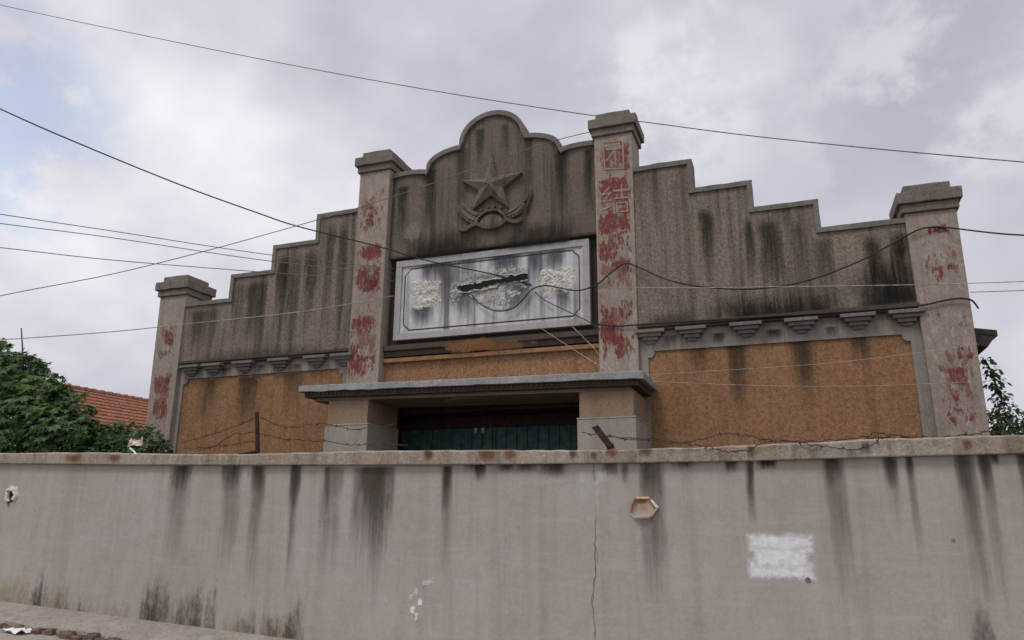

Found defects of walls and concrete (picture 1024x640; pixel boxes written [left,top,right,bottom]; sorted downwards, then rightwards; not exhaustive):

peeling [346,243,382,379]
spalling [410,266,577,313]
peeling [596,142,635,360]
leakage [863,236,914,306]
peeling [923,224,958,281]
peeling [150,373,171,426]
peeling [938,346,976,426]
leakage [291,465,299,493]
leakage [360,468,385,515]
leakage [443,466,451,492]
leakage [979,455,997,474]
crack [590,464,598,637]